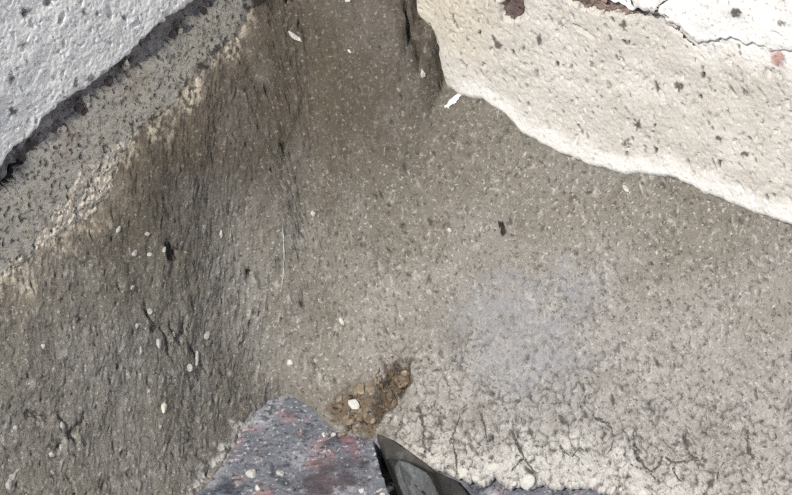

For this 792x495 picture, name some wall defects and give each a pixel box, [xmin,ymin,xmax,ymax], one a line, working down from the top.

spalling [502,0,524,19]
spalling [572,0,644,27]
crack [605,0,695,46]
crack [0,0,216,190]
spalling [330,356,413,438]
leakage [186,405,255,492]